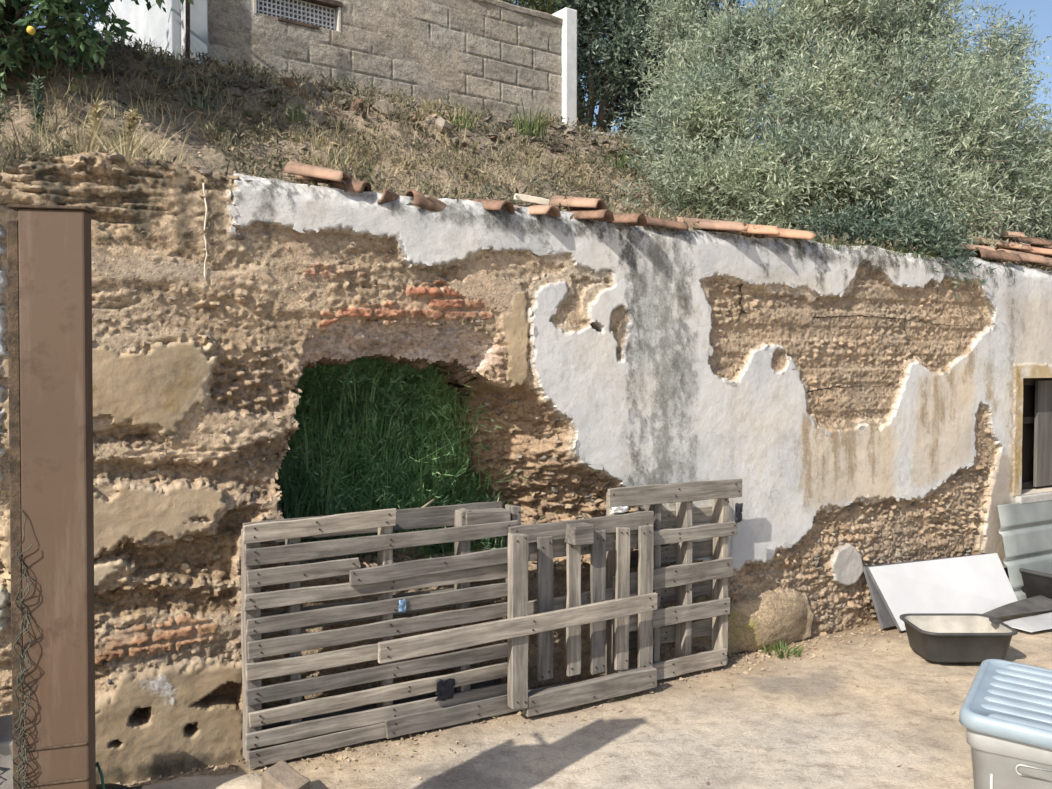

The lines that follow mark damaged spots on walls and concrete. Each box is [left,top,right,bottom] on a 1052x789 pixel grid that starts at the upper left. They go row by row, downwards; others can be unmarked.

leakage [485,206,603,239]
leakage [777,242,1015,285]
spalling [610,305,634,361]
leakage [619,225,696,485]
spalling [698,259,996,436]
crack [813,291,983,354]
spalling [0,151,630,716]
leakage [802,407,811,497]
spalling [728,402,1005,637]
spalling [628,649,638,668]
spalling [660,642,675,662]
spalling [691,635,712,654]